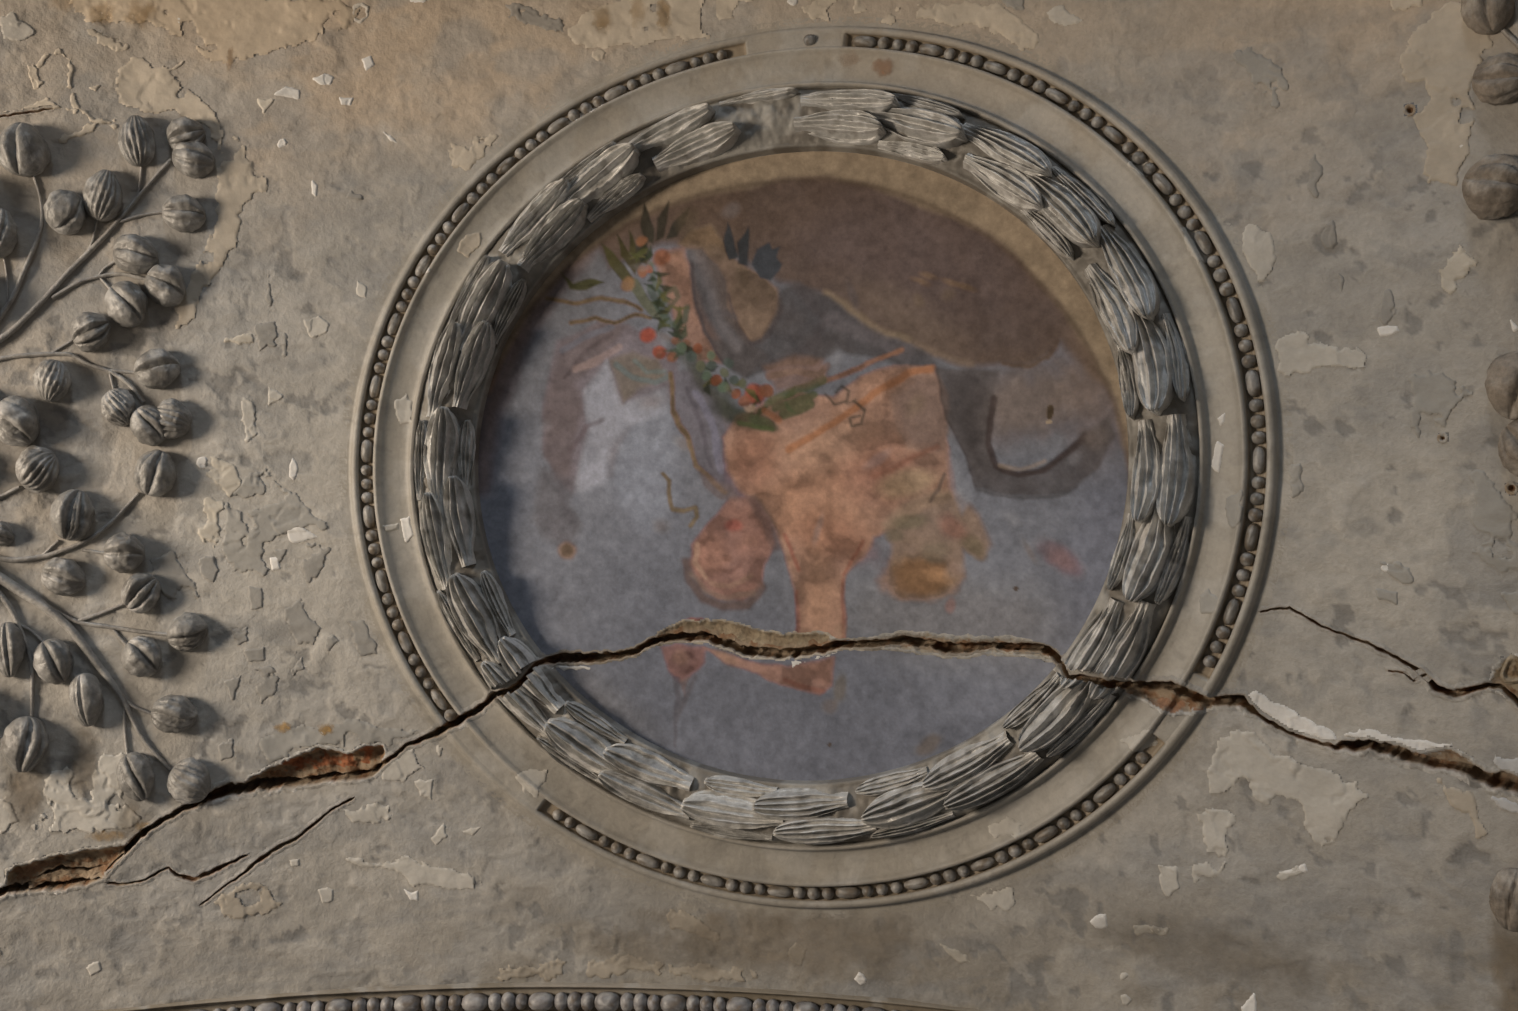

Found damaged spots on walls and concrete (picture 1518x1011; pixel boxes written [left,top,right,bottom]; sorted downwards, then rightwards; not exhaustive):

peeling [1389,0,1494,186]
peeling [150,456,378,704]
crack [1258,602,1518,713]
peeling [0,753,141,895]
peeling [344,802,391,825]
crack [0,625,1518,908]
peeling [1158,729,1369,897]
peeling [1248,690,1475,762]
peeling [1493,755,1518,773]
peeling [970,887,1016,911]
peeling [1090,914,1108,929]
peeling [1241,993,1257,1011]